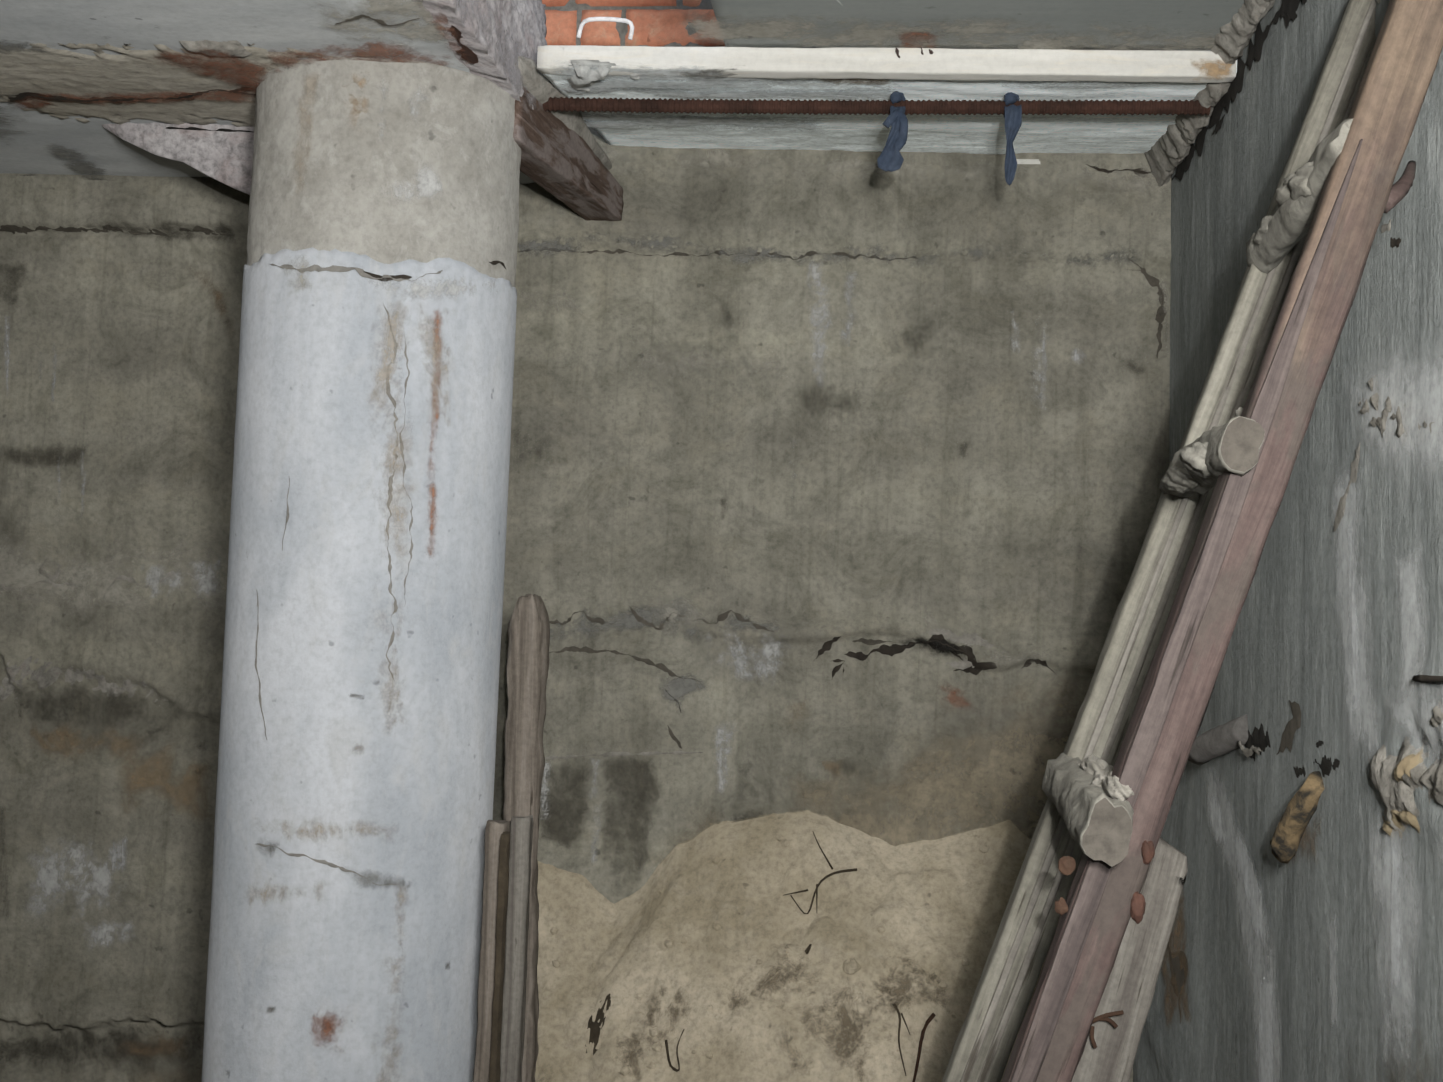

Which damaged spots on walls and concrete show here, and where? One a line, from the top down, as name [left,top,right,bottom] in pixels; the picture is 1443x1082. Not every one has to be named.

corrosion [158,40,309,92]
spalling [296,0,547,109]
crack [0,223,234,240]
corrosion [433,315,447,420]
crack [270,263,465,709]
crack [255,592,267,739]
crack [817,615,1055,678]
spalling [1394,697,1443,806]
water stain [541,764,585,845]
water stain [596,760,656,868]
peeling [1382,809,1420,839]
corrosion [314,1018,334,1036]